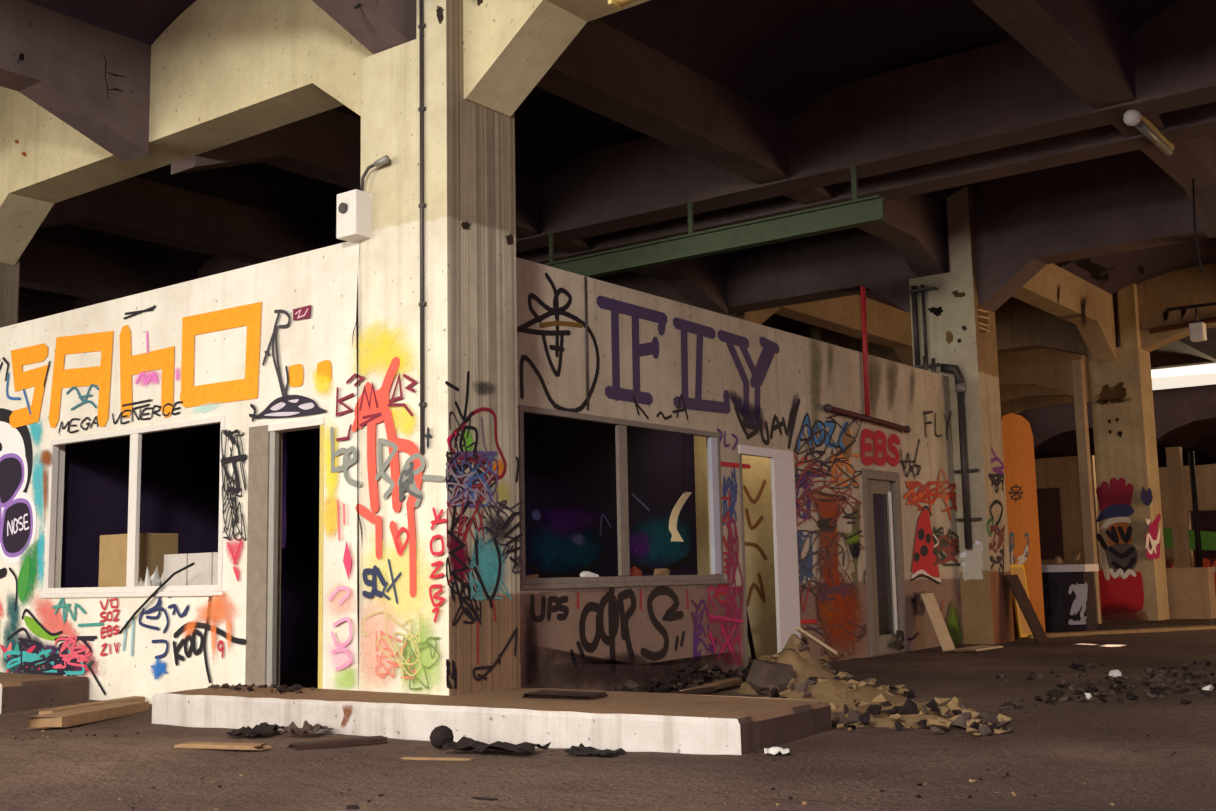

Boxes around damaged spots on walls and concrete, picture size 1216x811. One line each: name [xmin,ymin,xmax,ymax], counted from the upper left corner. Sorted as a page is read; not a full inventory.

damp [812,343,833,411]
damp [870,364,897,406]